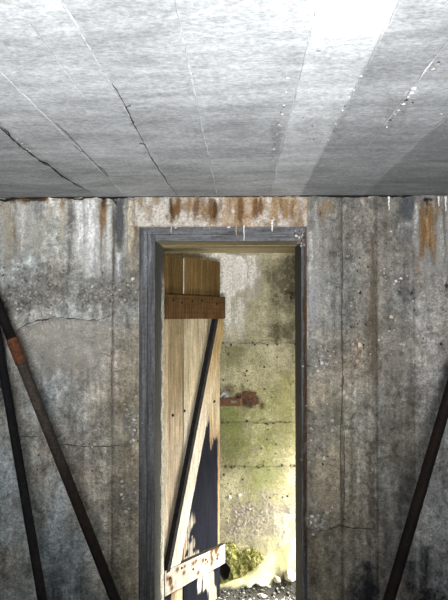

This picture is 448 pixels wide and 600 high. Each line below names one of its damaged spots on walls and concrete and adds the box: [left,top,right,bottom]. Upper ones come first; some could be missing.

crack [0,124,134,205]
rust [170,198,243,222]
rust [253,198,263,216]
rust [419,203,439,260]
water stain [200,253,261,336]
water stain [269,256,295,309]
crack [112,84,410,570]
crack [61,303,126,462]
rust [227,386,264,409]